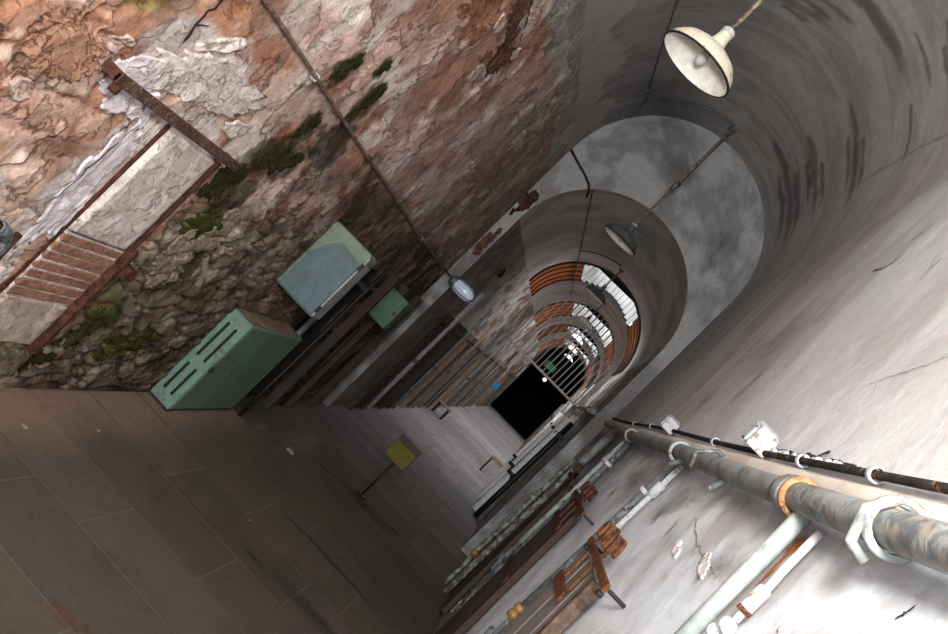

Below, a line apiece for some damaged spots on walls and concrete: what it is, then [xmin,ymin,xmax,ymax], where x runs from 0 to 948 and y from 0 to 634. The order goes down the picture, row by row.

crack [181,0,224,45]
flaking render [0,0,268,291]
crack [862,355,947,394]
crack [684,518,726,578]